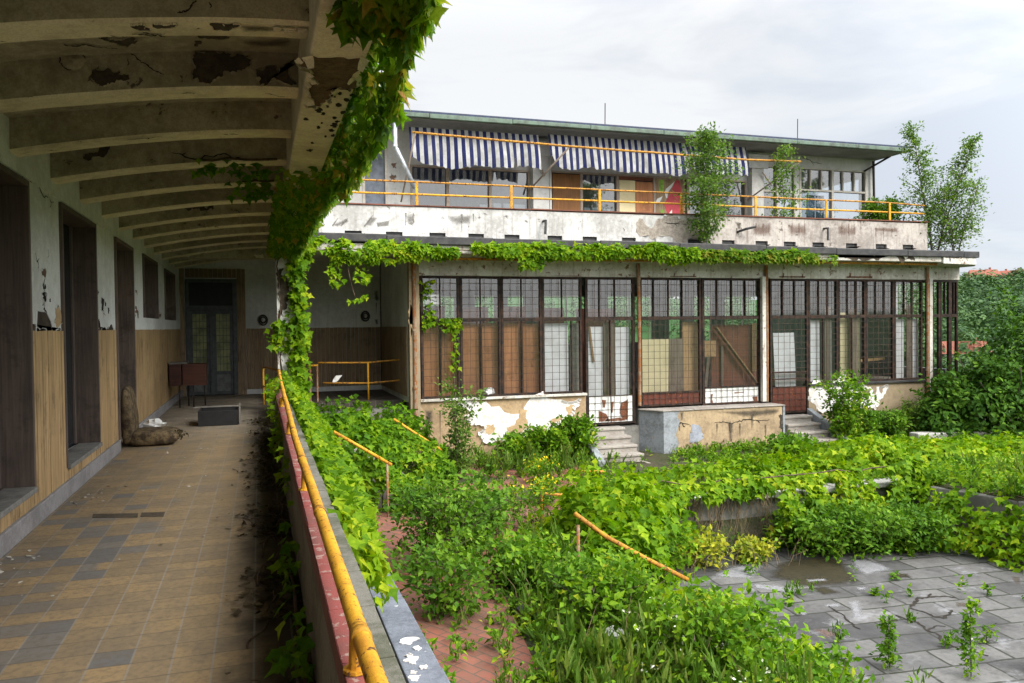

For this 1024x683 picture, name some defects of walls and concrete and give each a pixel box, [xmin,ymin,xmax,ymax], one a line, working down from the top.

flaking render [91,68,130,87]
spalling [191,23,370,152]
peeling [33,268,62,331]
peeling [457,391,581,443]
crack [715,419,768,432]